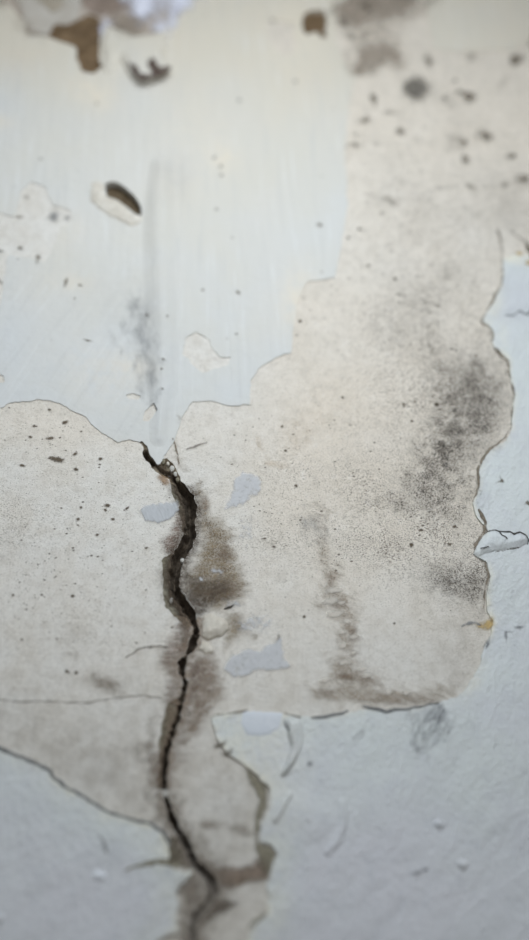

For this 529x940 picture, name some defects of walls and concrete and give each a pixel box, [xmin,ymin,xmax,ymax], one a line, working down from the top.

flaking render [0,0,180,85]
damp [333,0,429,73]
peeling [0,183,72,303]
peeling [90,182,143,226]
peeling [157,0,529,940]
damp [392,353,501,521]
peeling [0,400,193,847]
damp [162,483,248,697]
damp [429,565,488,604]
crack [0,438,223,940]
damp [204,771,275,888]
damp [200,901,234,922]